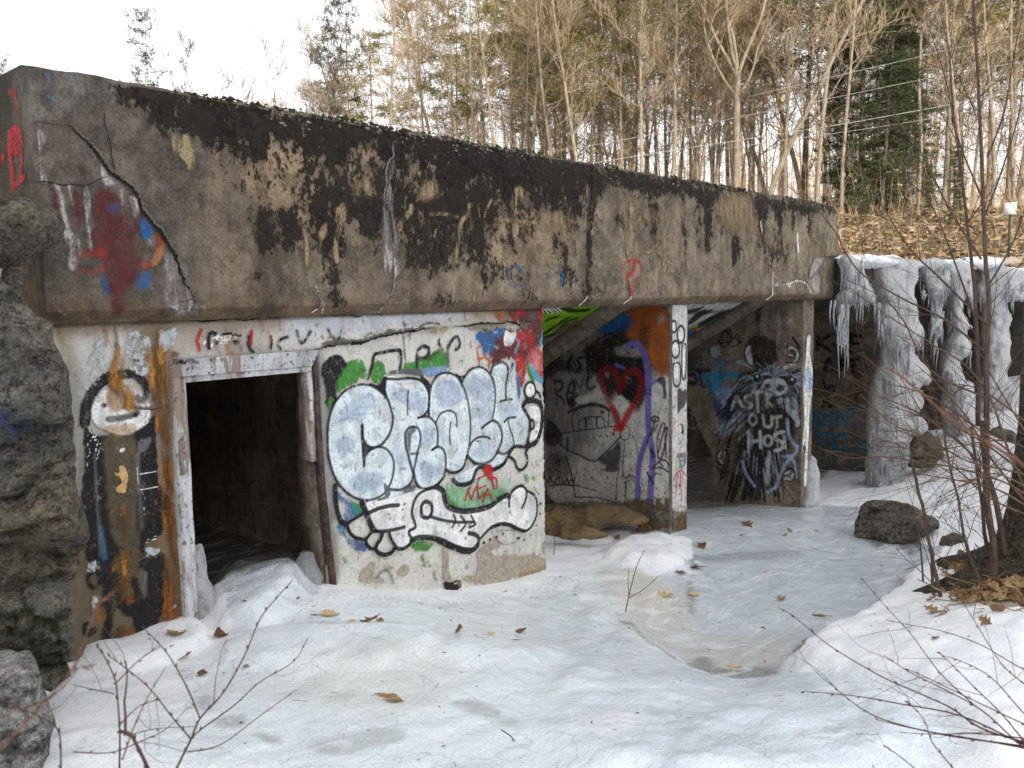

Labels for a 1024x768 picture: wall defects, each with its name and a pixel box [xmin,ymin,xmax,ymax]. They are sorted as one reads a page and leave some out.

water stain [40,175,92,270]
water stain [101,165,139,216]
crack [30,107,284,323]
water stain [109,84,836,339]
peeling [359,540,546,590]